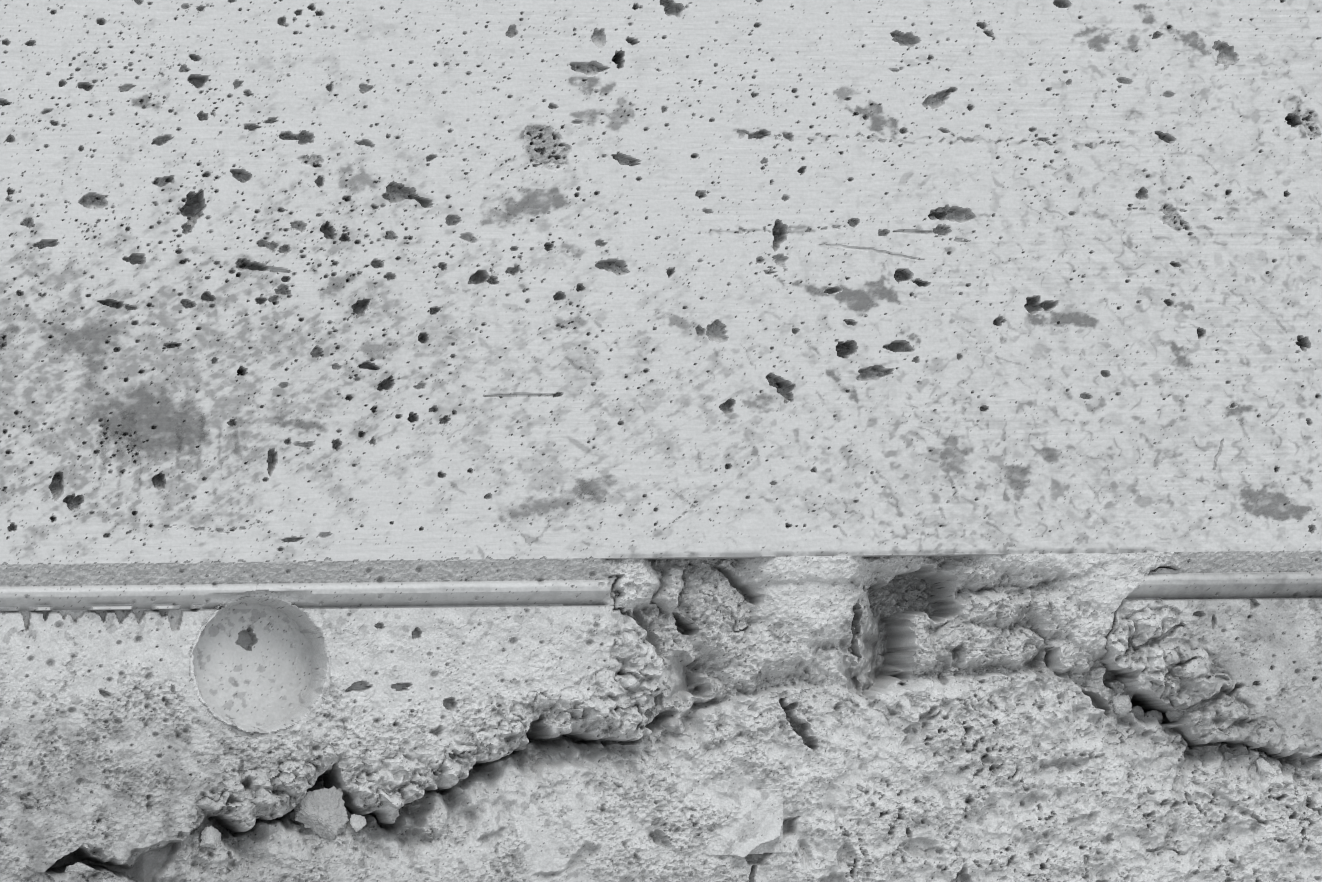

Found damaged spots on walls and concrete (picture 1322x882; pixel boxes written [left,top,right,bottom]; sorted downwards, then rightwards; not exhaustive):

spalling [603,553,1181,725]
crack [206,713,649,841]
crack [1082,618,1322,854]
crack [45,841,180,882]
crack [748,865,758,882]